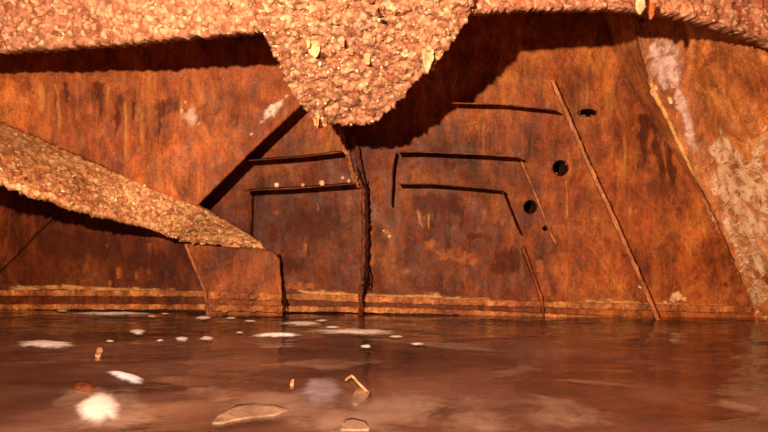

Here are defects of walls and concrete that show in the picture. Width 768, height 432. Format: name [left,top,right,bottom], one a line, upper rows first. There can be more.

water stain [94,82,104,114]
water stain [157,100,175,133]
crack [356,166,371,303]
peeling [706,125,768,319]
water stain [299,290,488,300]
rust [663,291,687,304]